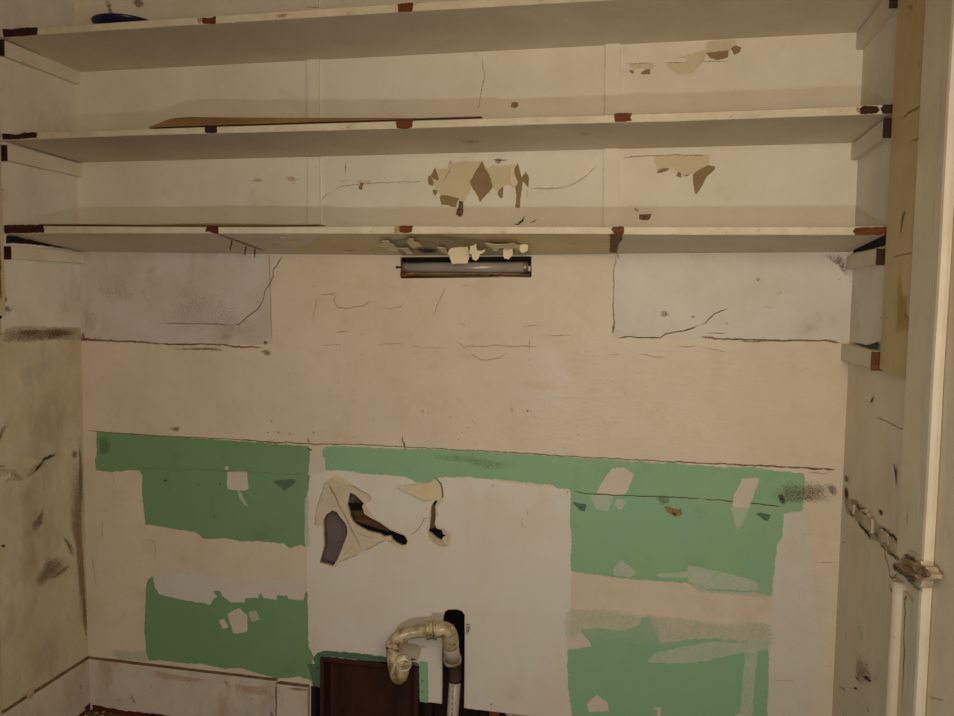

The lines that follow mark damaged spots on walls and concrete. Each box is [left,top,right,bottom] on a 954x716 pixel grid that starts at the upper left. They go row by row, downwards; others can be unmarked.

peeling [626,39,741,75]
peeling [428,159,529,217]
peeling [626,154,715,194]
peeling [379,237,529,264]
crack [81,234,282,348]
crack [611,257,840,357]
damp [771,477,848,504]
spalling [315,475,452,568]
spalling [665,506,682,517]
spalling [422,609,526,716]
spalling [311,686,320,716]